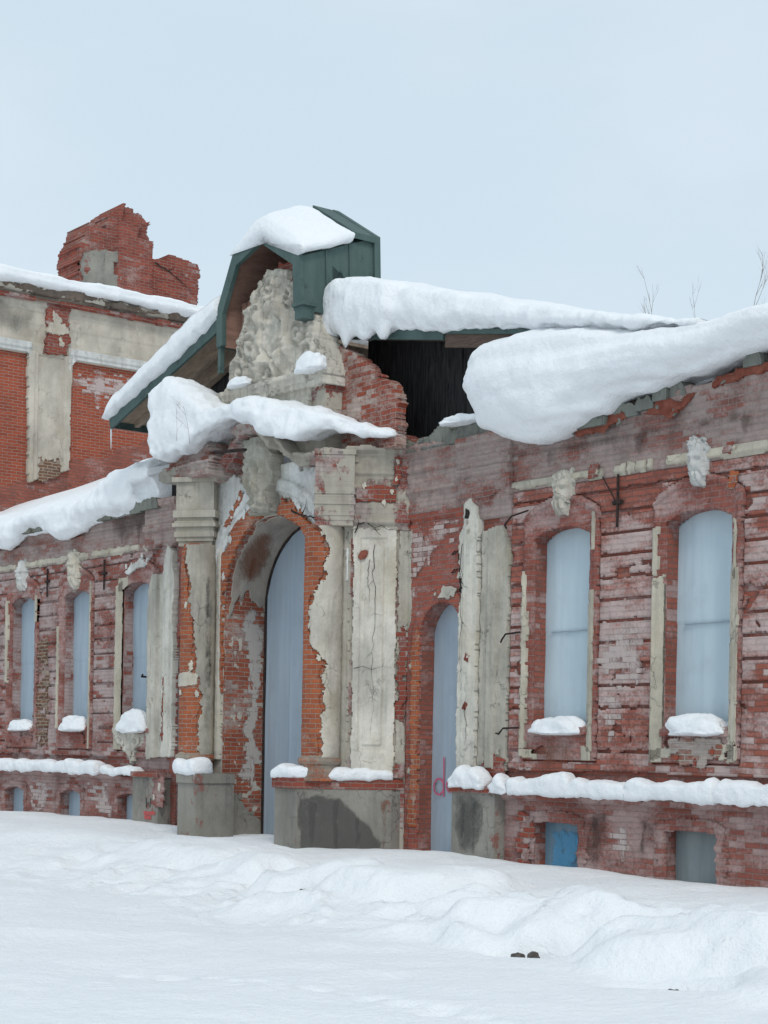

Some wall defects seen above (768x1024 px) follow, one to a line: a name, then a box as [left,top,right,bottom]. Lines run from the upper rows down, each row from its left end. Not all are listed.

flaking render [43,303,72,356]
spalling [712,362,768,389]
spalling [572,410,627,438]
flaking render [355,457,402,506]
corrosion [243,536,269,578]
flaking render [219,490,264,693]
flaking render [178,549,202,753]
flaking render [277,493,328,756]
crack [354,521,390,731]
peeling [239,609,264,786]
leakage [298,796,380,849]
leakage [457,798,480,847]